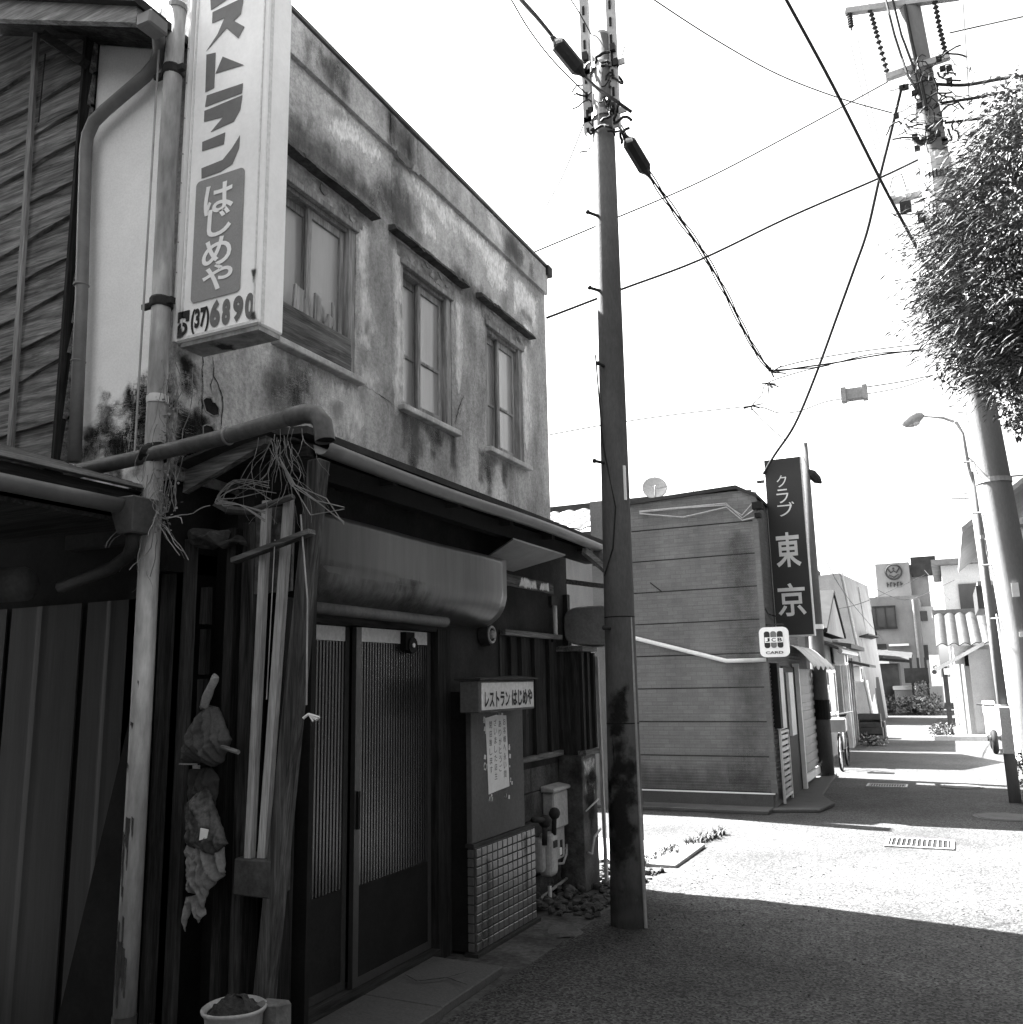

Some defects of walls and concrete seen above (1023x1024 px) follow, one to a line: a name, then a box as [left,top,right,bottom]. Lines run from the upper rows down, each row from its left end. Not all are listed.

leakage [328,102,381,160]
leakage [82,375,148,461]
leakage [166,354,209,443]
leakage [268,370,363,437]